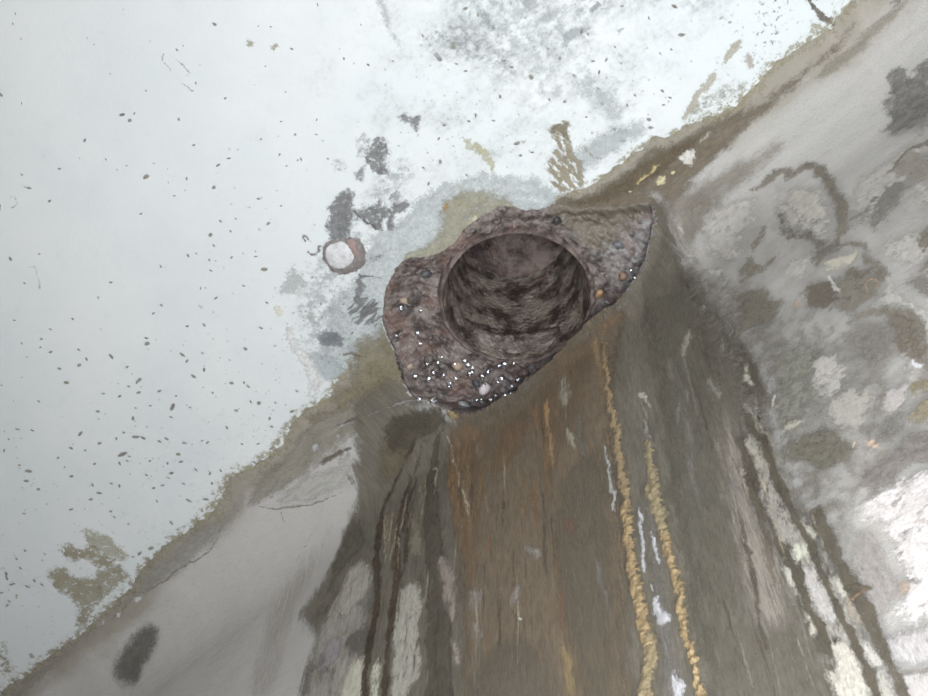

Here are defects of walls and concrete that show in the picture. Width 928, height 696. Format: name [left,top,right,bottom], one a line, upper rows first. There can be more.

water stain [491,0,590,47]
water stain [724,40,763,68]
crack [808,0,835,27]
water stain [818,9,900,77]
rust [347,239,359,257]
rust [404,190,513,260]
water stain [143,61,928,696]
flaking render [851,471,928,664]
water stain [115,627,158,684]